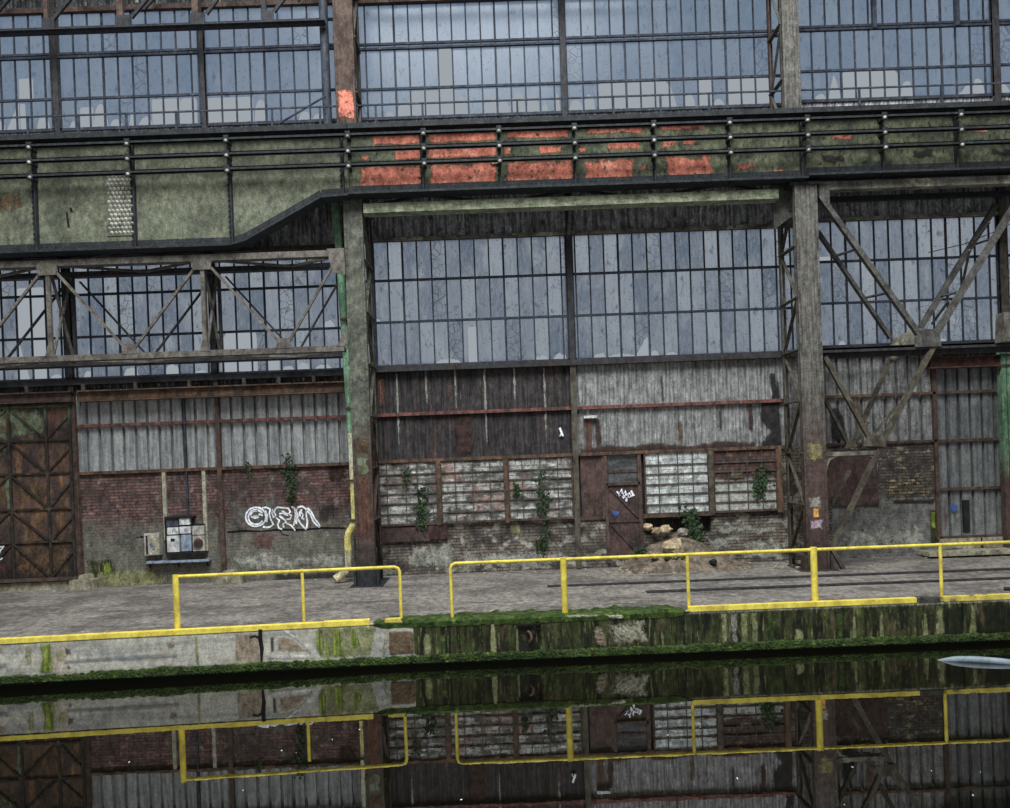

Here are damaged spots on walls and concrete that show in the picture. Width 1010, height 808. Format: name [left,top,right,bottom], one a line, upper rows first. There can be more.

peeling [359,130,573,186]
peeling [578,127,648,178]
peeling [661,125,713,175]
leakage [0,601,1010,691]